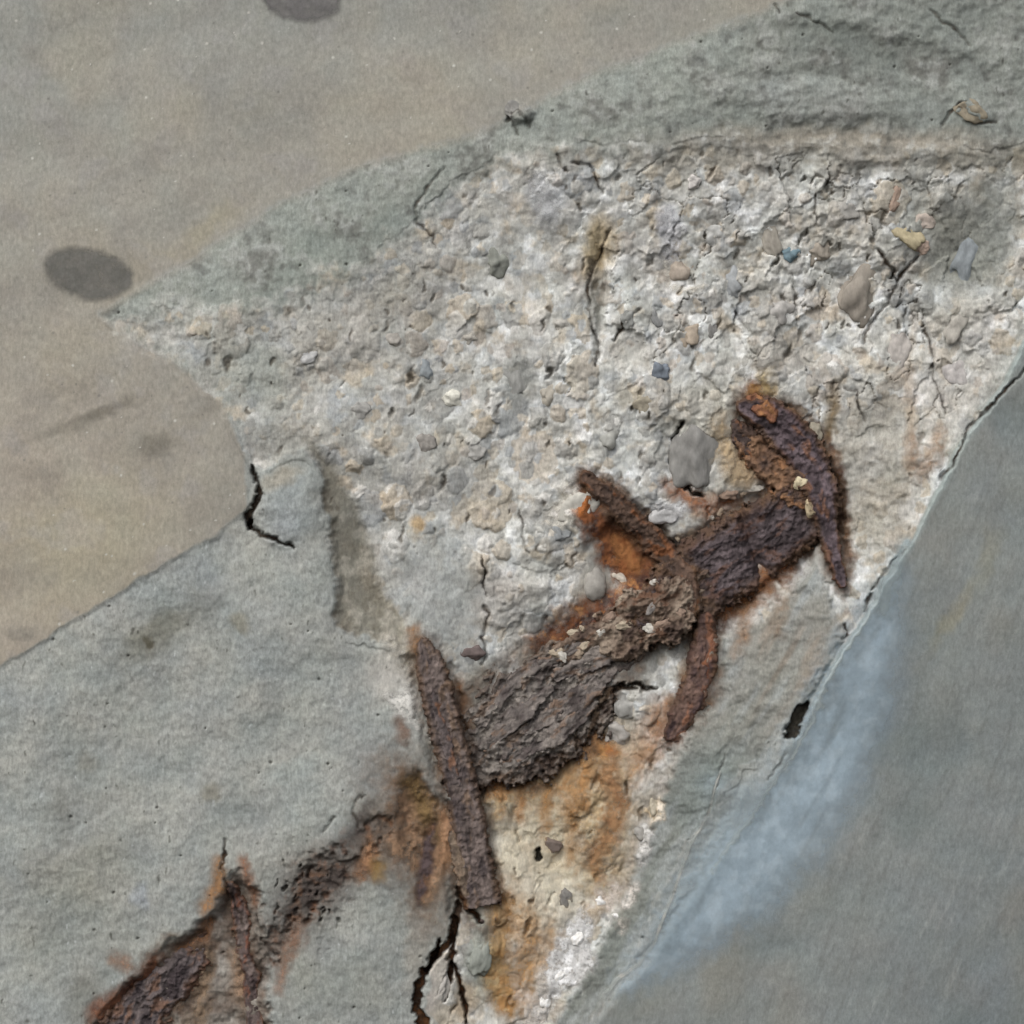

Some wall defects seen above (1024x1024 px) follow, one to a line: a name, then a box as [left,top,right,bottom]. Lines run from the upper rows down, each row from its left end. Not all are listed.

water stain [264,0,339,21]
water stain [45,248,131,299]
crack [244,466,294,548]
spalling [95,140,1024,1024]
rust [528,486,656,652]
rust [664,482,735,515]
rust [716,556,796,621]
rust [288,765,454,917]
rust [485,700,669,888]
rust [90,955,158,1021]
rust [176,858,225,1024]
crack [412,885,480,1024]